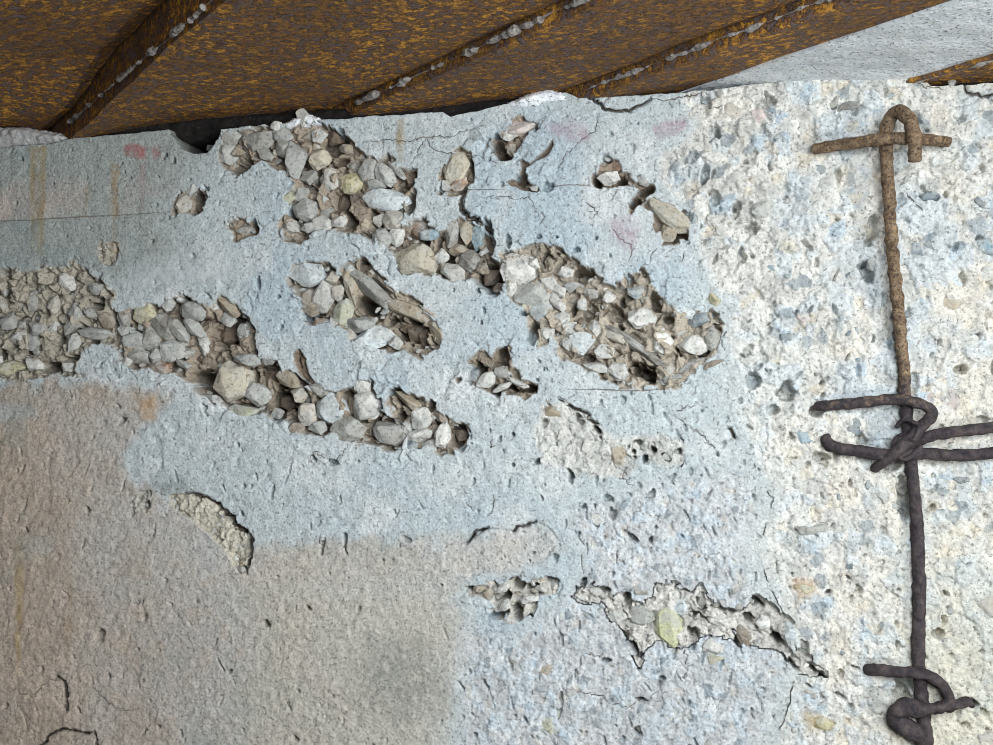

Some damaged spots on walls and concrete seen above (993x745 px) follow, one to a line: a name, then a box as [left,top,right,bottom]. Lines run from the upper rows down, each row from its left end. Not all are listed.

spalling [0,273,469,455]
spalling [216,79,993,745]
peeling [166,493,253,574]
crack [14,675,151,745]